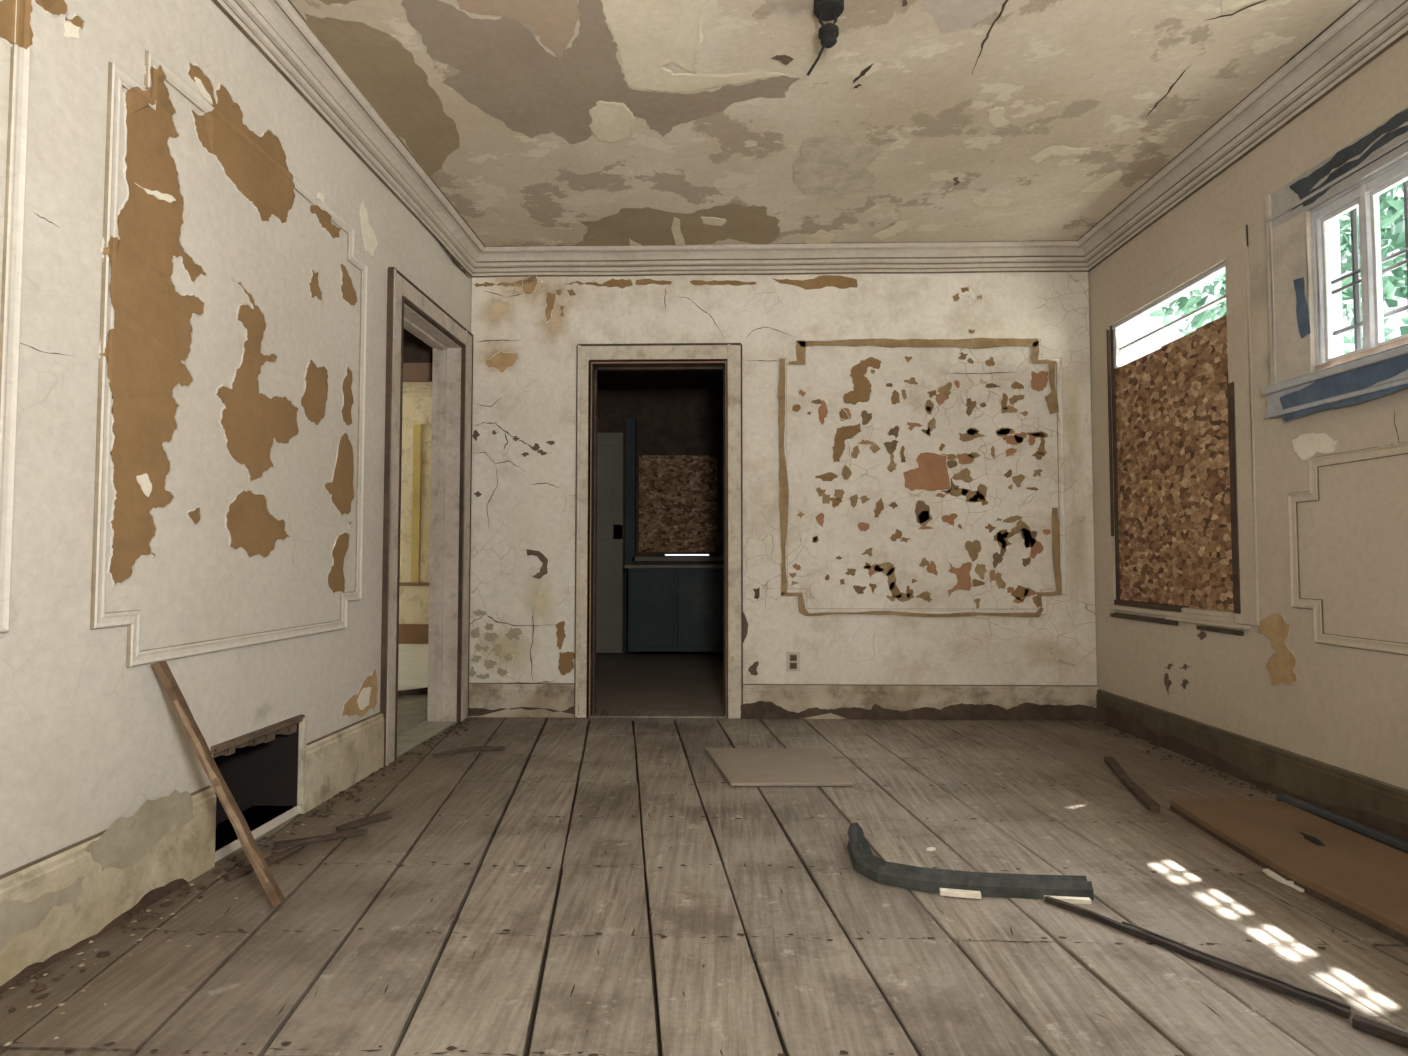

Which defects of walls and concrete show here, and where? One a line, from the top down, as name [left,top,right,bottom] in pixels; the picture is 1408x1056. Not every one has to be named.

peeling [0,0,85,50]
crack [972,0,1009,74]
peeling [97,60,355,594]
peeling [473,276,672,323]
peeling [689,275,858,290]
peeling [952,286,983,303]
peeling [778,328,1062,617]
peeling [1257,613,1298,687]